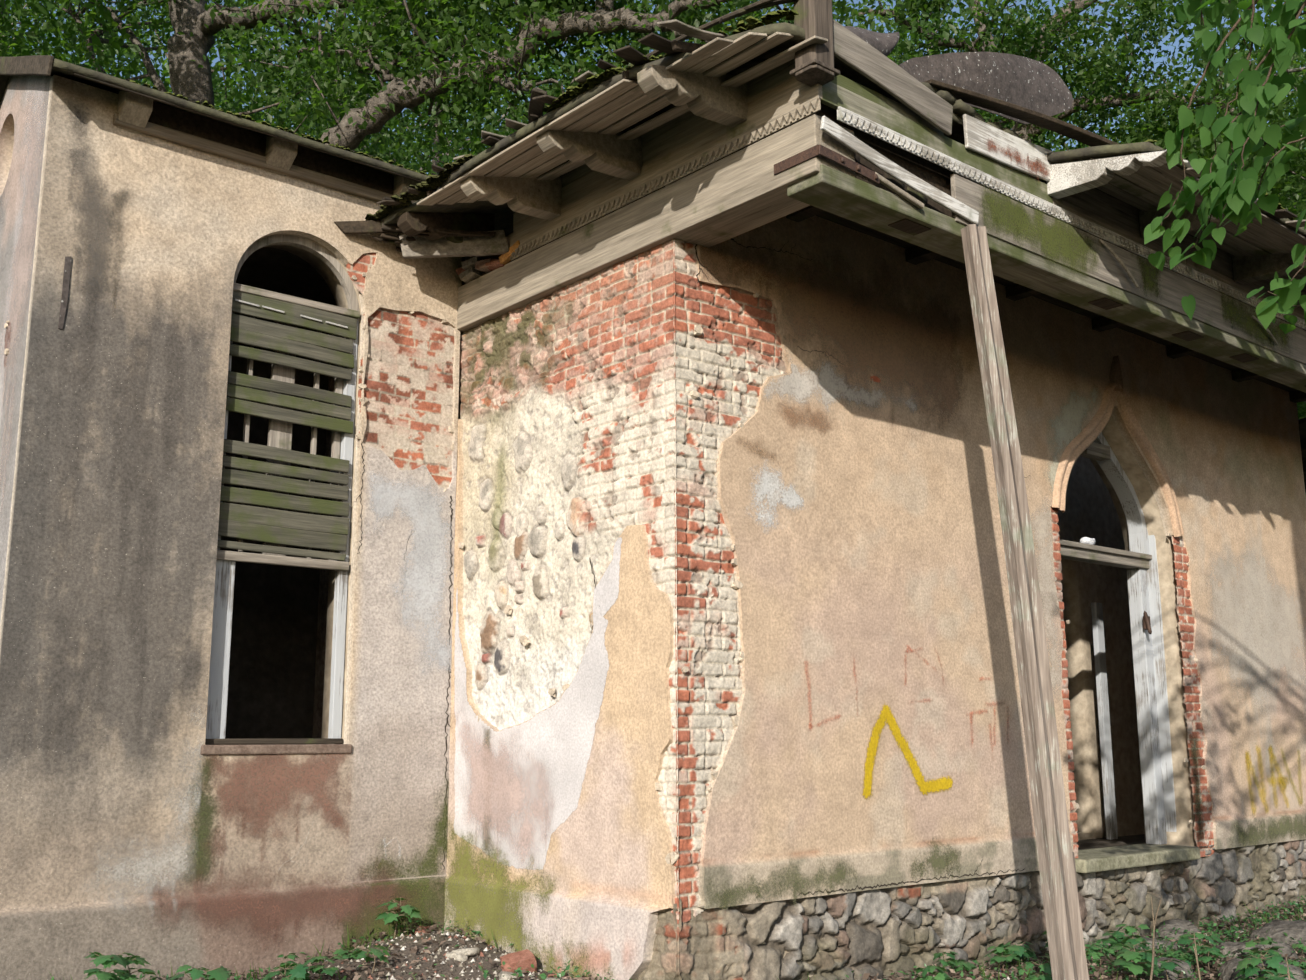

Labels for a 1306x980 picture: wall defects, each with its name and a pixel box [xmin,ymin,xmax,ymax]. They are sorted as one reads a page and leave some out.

water stain [76,149,128,295]
flaking render [346,253,376,294]
flaking render [355,238,886,980]
flaking render [1031,503,1080,858]
flaking render [1167,533,1214,857]
water stain [114,746,217,885]
water stain [343,787,593,979]
water stain [709,862,855,908]
water stain [912,842,959,878]